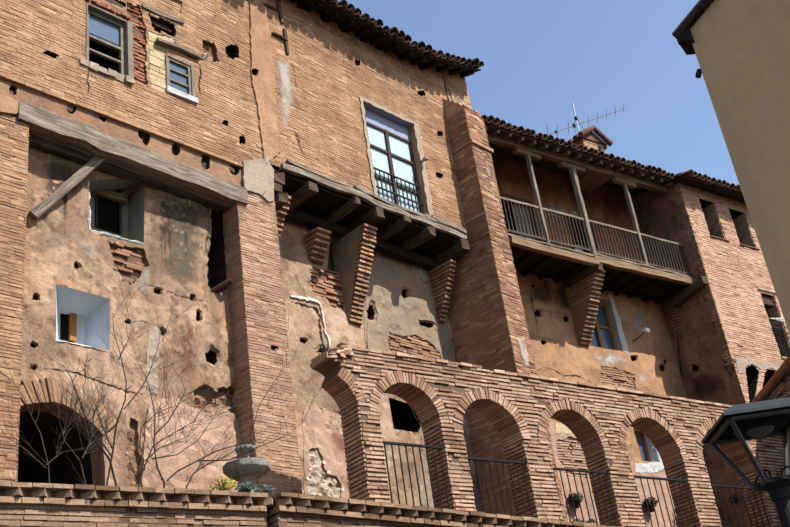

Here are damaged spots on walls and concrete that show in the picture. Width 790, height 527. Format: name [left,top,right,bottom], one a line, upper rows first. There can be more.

flaking render [105,0,176,85]
flaking render [107,239,150,284]
spalling [418,320,437,329]
flaking render [388,333,441,359]
flaking render [599,364,636,388]
flaking render [193,384,237,413]
flaking render [306,448,345,498]